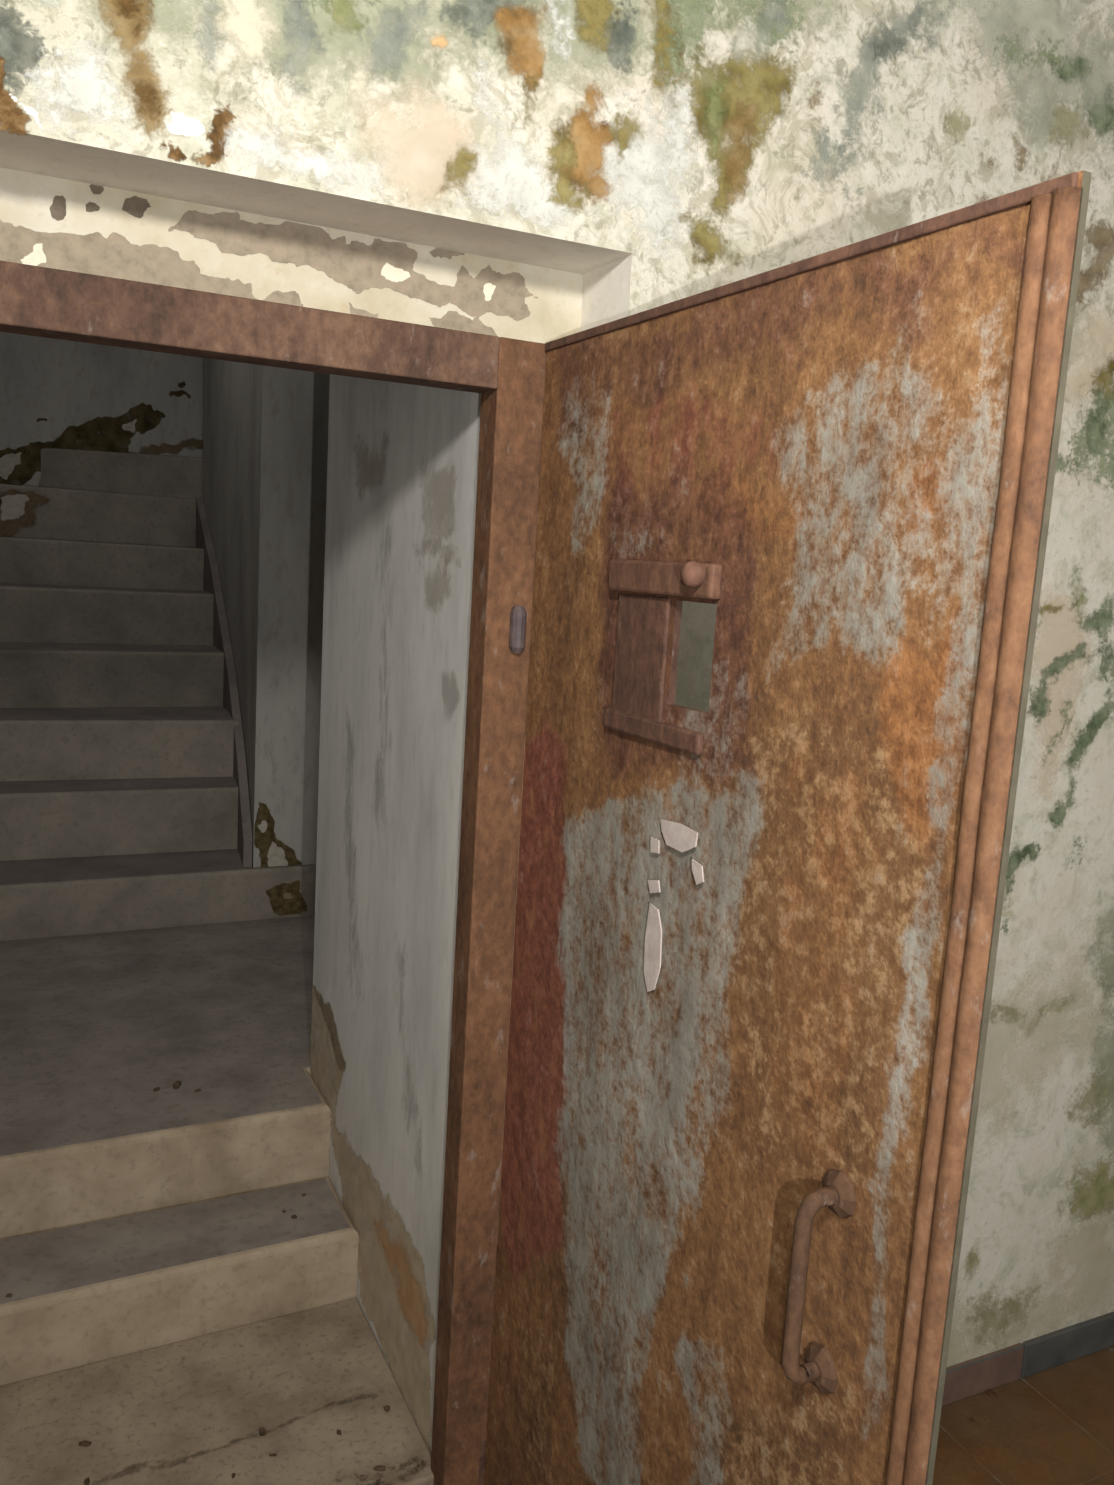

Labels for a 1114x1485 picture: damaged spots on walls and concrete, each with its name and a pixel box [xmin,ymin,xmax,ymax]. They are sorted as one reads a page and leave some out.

peeling [86,184,104,212]
leakage [0,0,395,193]
peeling [0,196,538,336]
leakage [255,0,837,265]
leakage [810,5,943,177]
leakage [959,0,1114,170]
flaking render [0,403,203,537]
leakage [1056,316,1114,488]
crack [1038,605,1062,614]
leakage [1027,580,1114,827]
flaking render [254,802,307,916]
leakage [1002,844,1040,933]